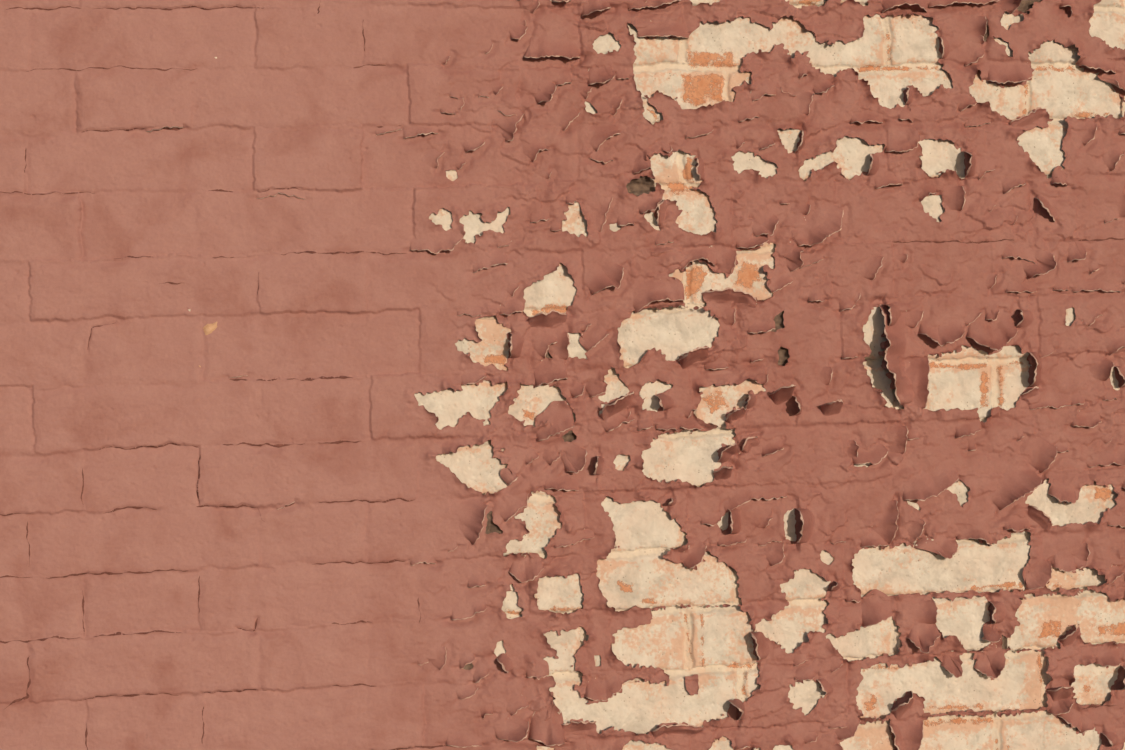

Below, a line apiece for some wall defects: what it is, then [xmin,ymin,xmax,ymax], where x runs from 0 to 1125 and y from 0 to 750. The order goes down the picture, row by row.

crack [6,4,263,12]
crack [83,125,183,133]
peeling [593,0,1125,186]
peeling [918,139,976,222]
crack [230,374,352,382]
peeling [863,303,1042,451]
peeling [1089,358,1125,390]
crack [81,441,413,521]
peeling [436,440,584,619]
crack [0,513,200,708]
peeling [480,437,1125,750]
crack [79,689,267,750]